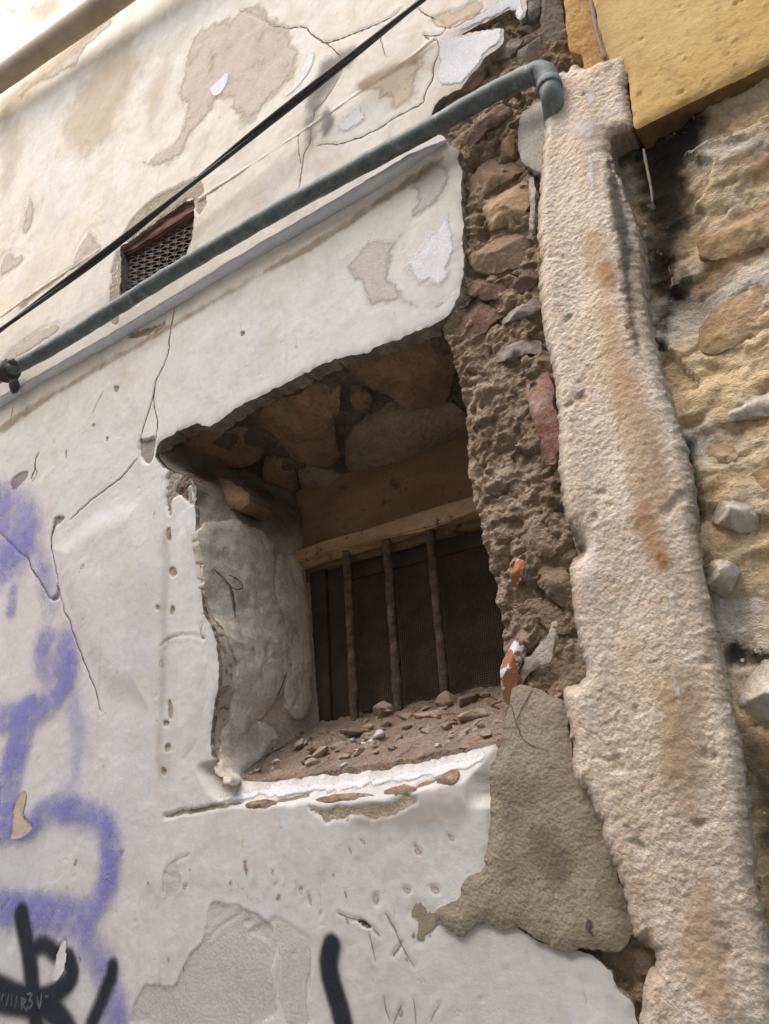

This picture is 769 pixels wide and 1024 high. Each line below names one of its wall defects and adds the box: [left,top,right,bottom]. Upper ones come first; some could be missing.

peeling [144,5,314,165]
crack [242,8,450,189]
spalling [432,0,584,110]
leakage [607,111,709,345]
spalling [406,86,587,700]
crack [1,310,175,710]
leakage [685,437,703,534]
leakage [725,643,769,665]
flaking render [310,795,417,822]
peeling [130,901,277,1024]
peeling [411,903,437,941]
spalling [580,935,656,1022]